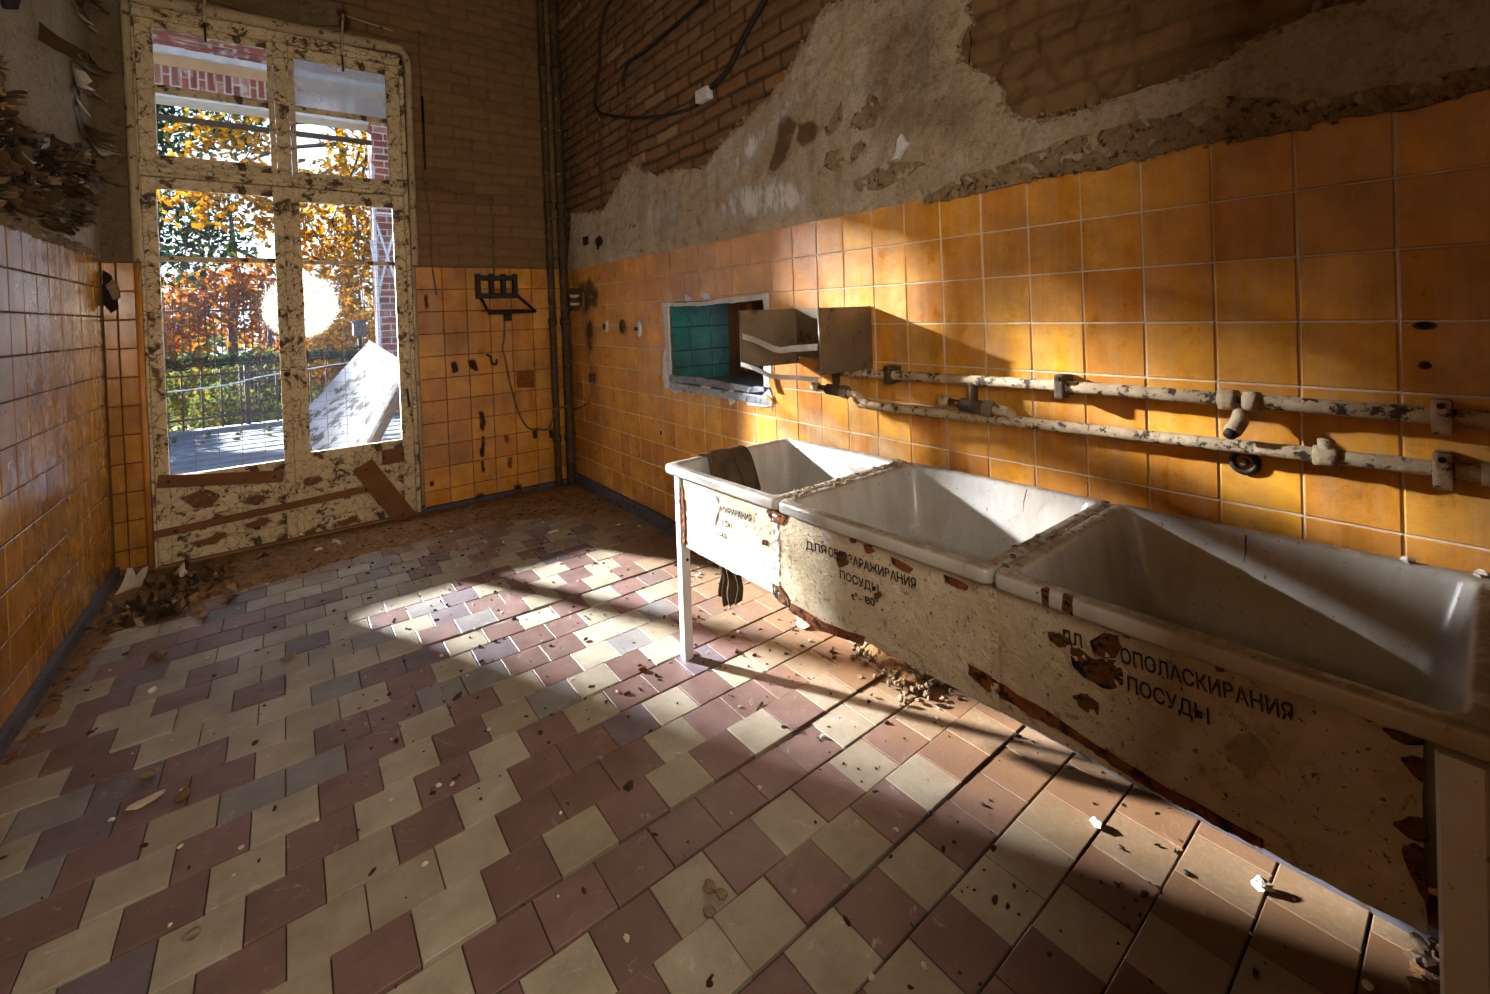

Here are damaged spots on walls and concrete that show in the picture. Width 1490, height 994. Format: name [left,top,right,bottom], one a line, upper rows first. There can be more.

spalling [0,0,21,10]
flaking render [956,0,1365,123]
peeling [0,21,128,313]
spalling [769,93,926,192]
spalling [922,65,1490,205]